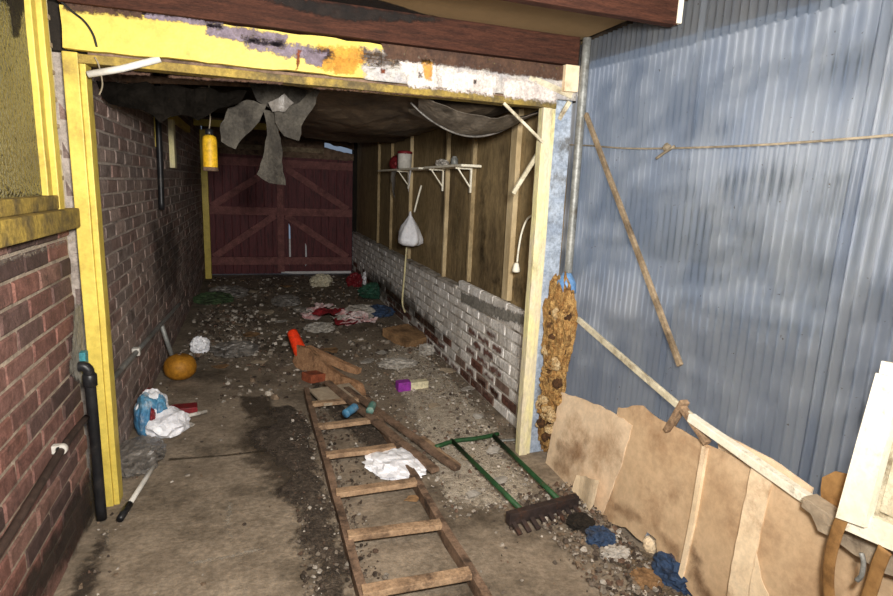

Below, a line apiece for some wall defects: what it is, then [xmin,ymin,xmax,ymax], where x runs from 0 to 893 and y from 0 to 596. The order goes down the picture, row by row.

peeling [63,3,580,103]
leakage [268,0,440,23]